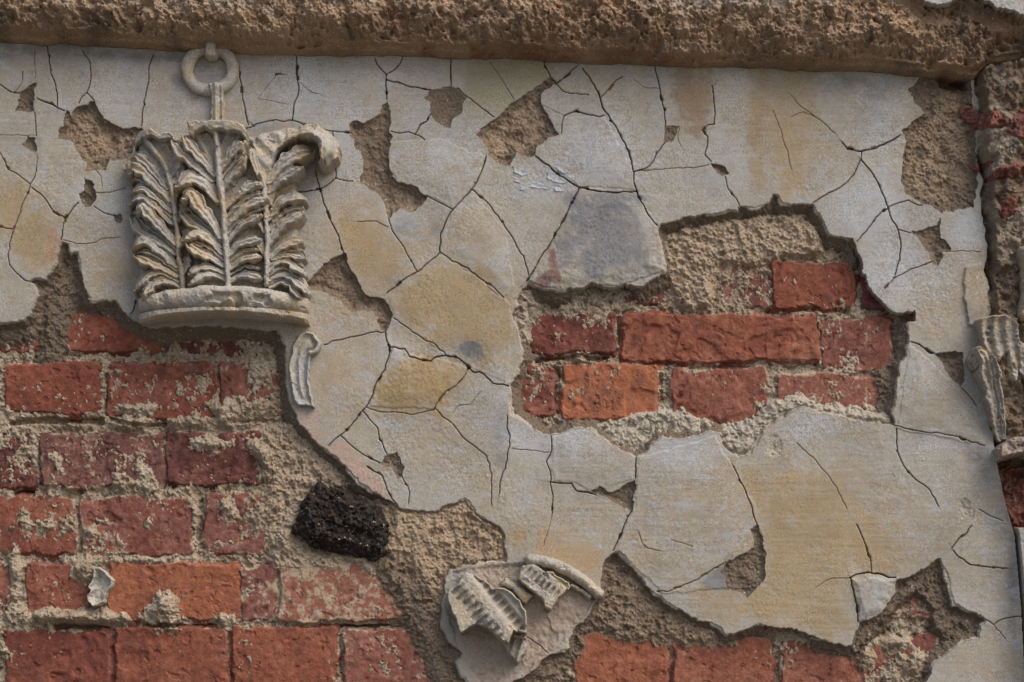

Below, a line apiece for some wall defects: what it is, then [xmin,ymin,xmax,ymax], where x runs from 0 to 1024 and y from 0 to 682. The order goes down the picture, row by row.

crack [0,47,125,282]
spalling [58,101,143,207]
crack [239,55,350,136]
spalling [349,102,427,219]
crack [298,57,739,297]
crack [772,94,981,289]
spalling [901,77,1024,266]
spalling [508,194,916,460]
spalling [0,240,508,682]
crack [324,318,595,546]
spalling [513,551,987,682]
crack [798,444,895,622]